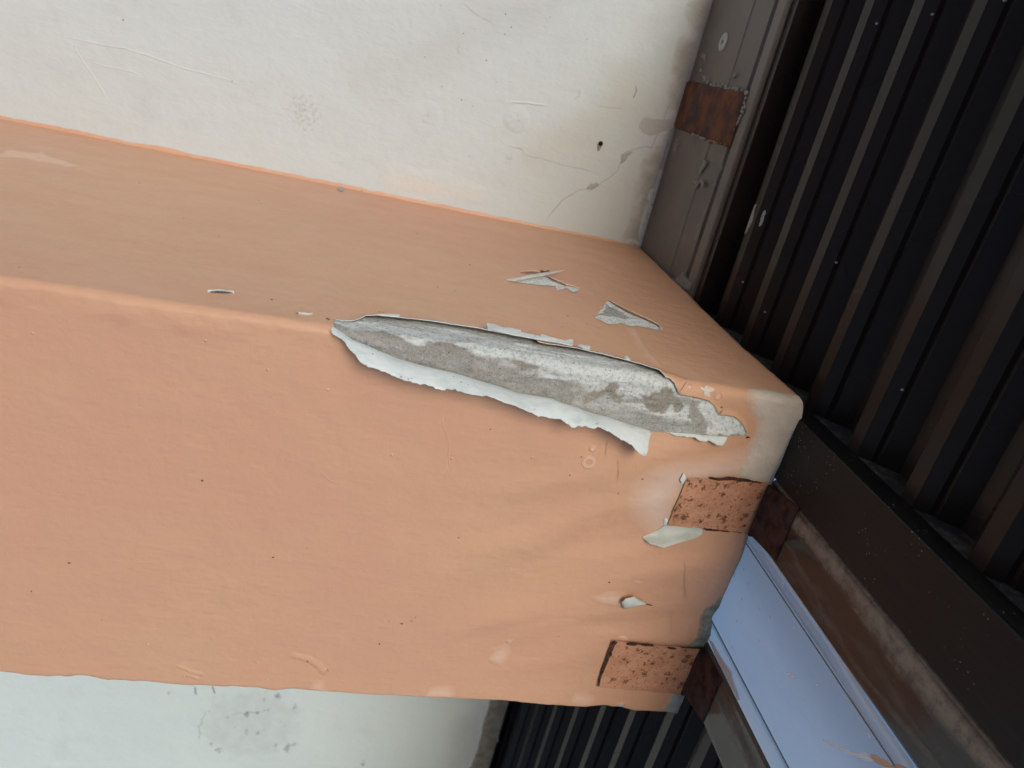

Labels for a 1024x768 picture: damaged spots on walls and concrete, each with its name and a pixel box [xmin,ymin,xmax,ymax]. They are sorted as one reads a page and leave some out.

peeling [506,270,579,292]
peeling [595,300,664,330]
peeling [331,313,803,485]
rust [667,476,769,533]
peeling [642,517,703,548]
peeling [622,597,652,609]
rust [597,640,704,695]